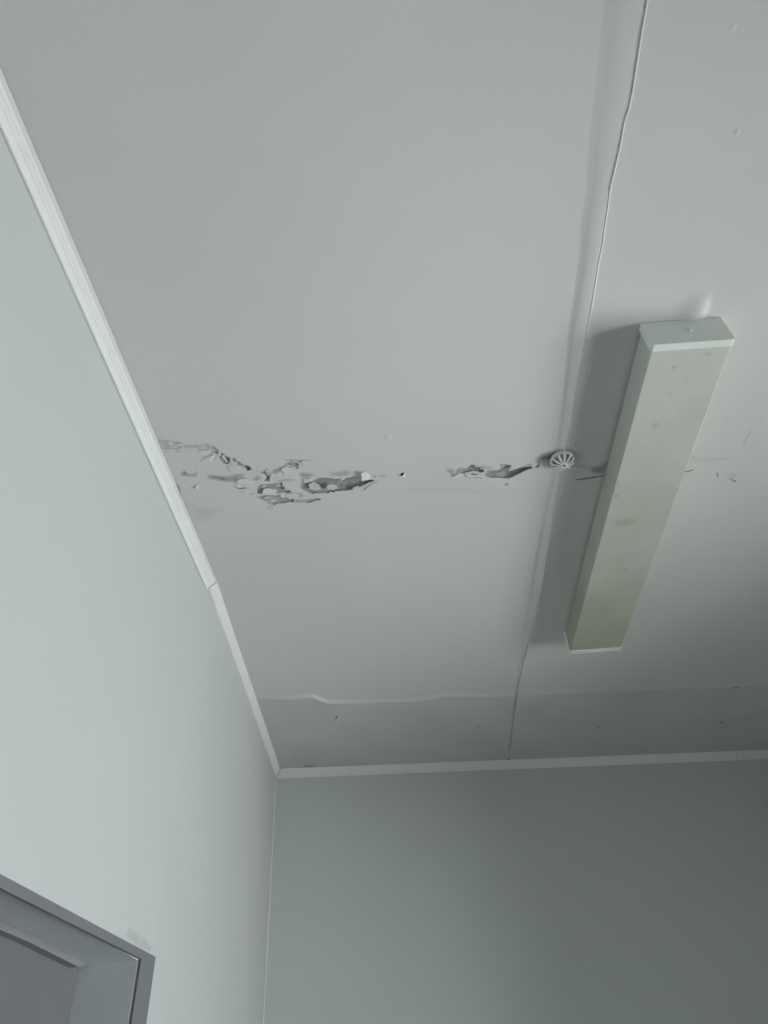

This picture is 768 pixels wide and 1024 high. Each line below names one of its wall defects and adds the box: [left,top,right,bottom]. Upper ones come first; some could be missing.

crack [564,0,647,447]
peeling [158,439,386,510]
peeling [455,462,540,486]
crack [508,475,605,751]